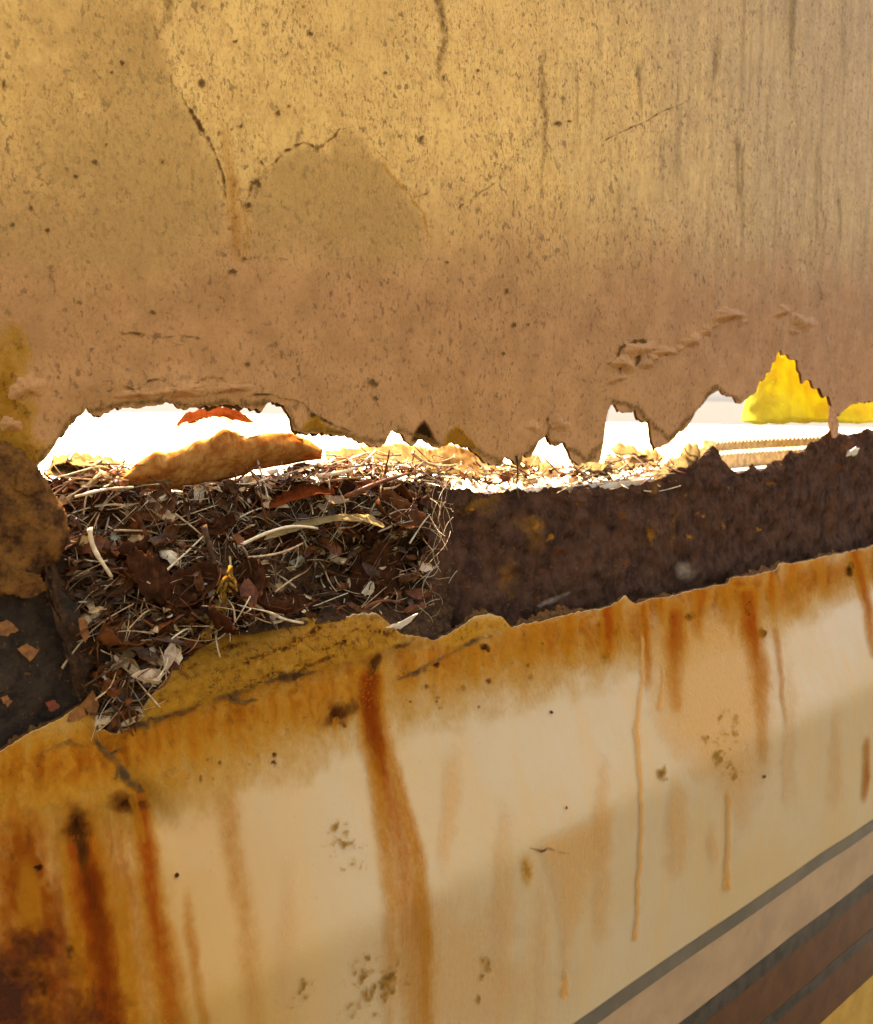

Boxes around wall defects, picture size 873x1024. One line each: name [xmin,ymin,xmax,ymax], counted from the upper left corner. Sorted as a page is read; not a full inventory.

crack [181,93,345,197]
peeling [303,417,347,436]
peeling [413,421,481,457]
peeling [828,406,839,438]
peeling [0,562,47,598]
peeling [0,620,18,637]
peeling [18,643,39,661]
peeling [78,617,90,643]
peeling [142,613,418,717]
peeling [440,617,509,665]
spalling [328,703,358,730]
rust [0,544,873,1024]